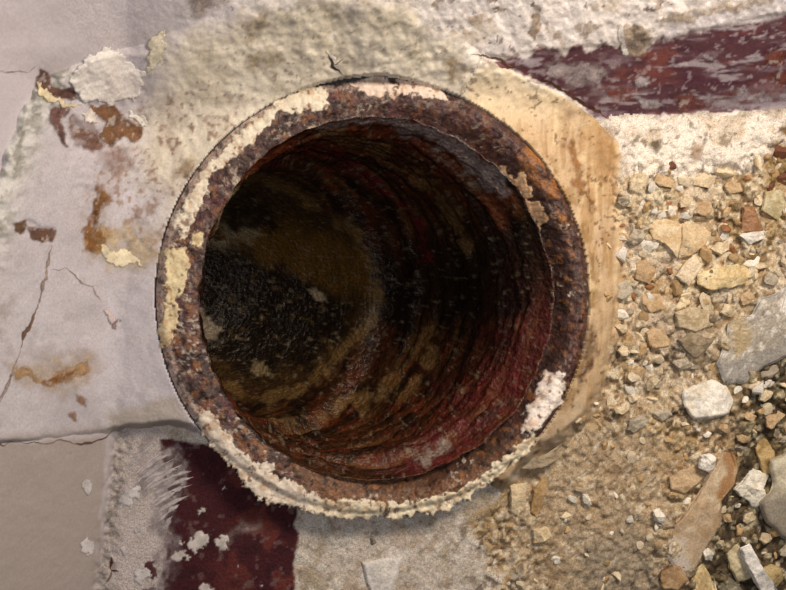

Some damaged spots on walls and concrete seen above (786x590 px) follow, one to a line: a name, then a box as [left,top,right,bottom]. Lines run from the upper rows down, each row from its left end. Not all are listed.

flaking render [618,24,651,56]
peeling [36,69,148,158]
rust [569,140,587,192]
peeling [15,220,56,242]
rust [83,186,110,254]
spalling [739,231,765,245]
peeling [101,244,142,267]
crack [0,248,100,402]
rust [15,362,89,386]
crack [0,434,109,446]
peeling [755,438,775,474]
peeling [143,561,157,590]